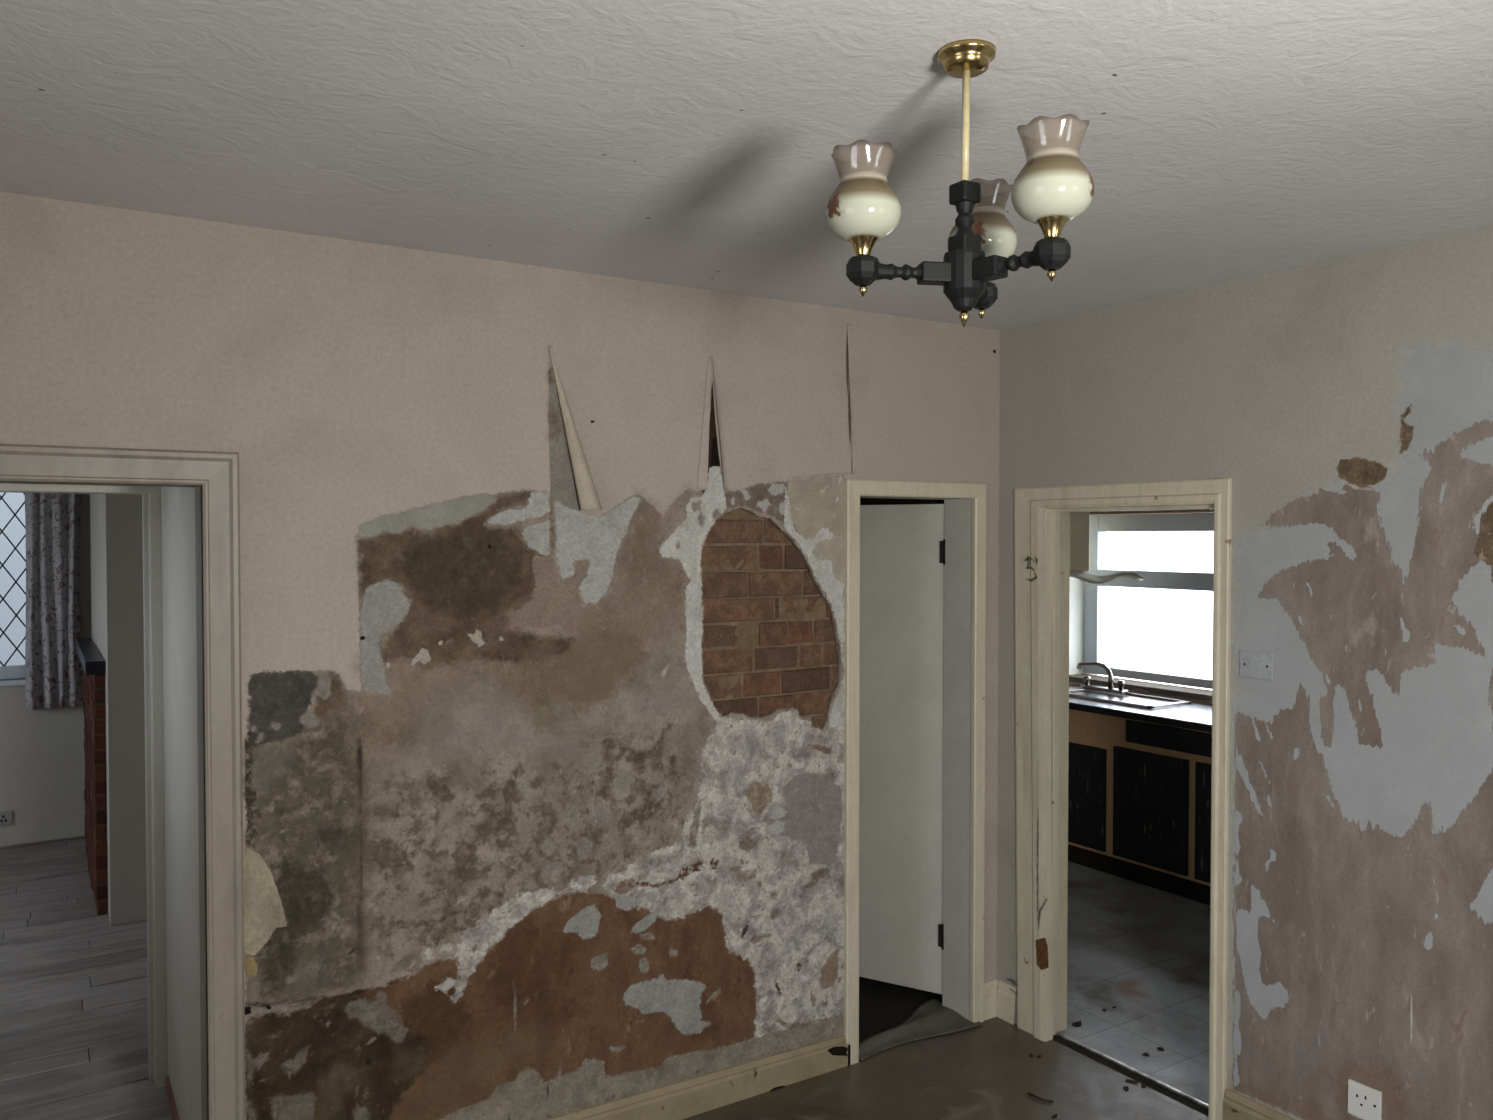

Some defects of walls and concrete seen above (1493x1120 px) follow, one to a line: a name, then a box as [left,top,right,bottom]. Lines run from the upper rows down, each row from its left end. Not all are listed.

flaking render [1474,495,1493,582]
flaking render [245,732,253,845]
leakage [244,491,683,1120]
flaking render [317,466,848,1120]
peeling [1233,792,1289,1086]
peeling [1424,914,1439,950]